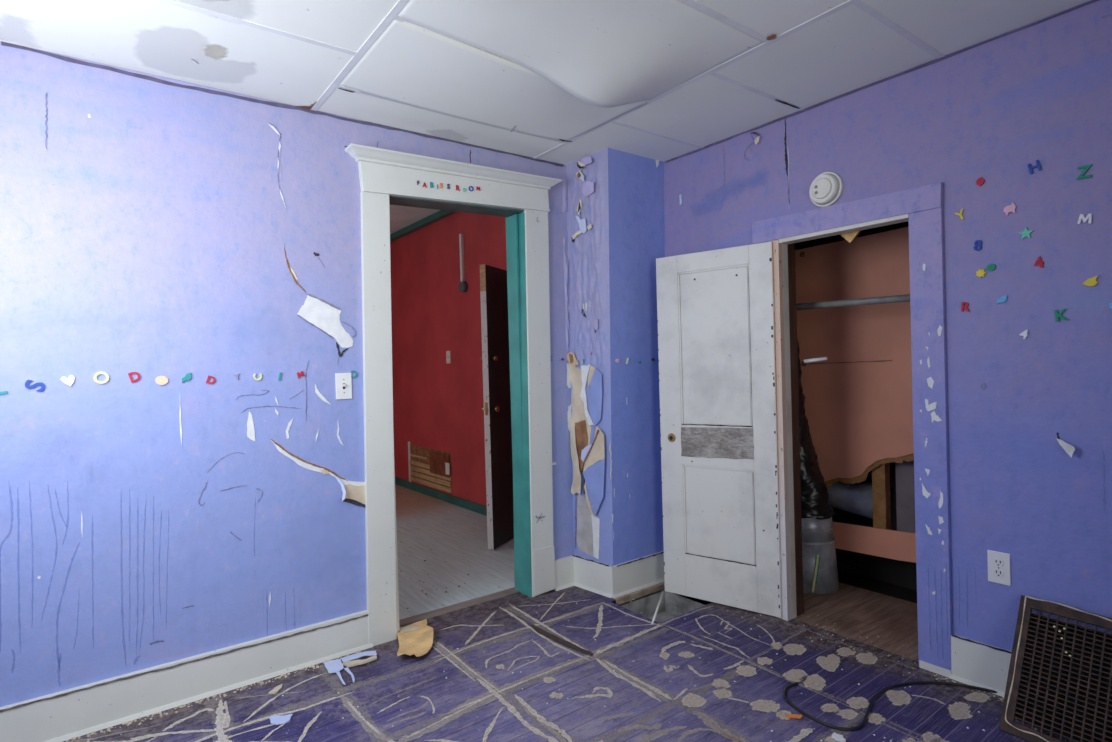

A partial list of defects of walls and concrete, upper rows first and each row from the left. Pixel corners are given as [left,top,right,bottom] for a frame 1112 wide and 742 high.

crack [665,0,1111,193]
peeling [572,157,594,242]
peeling [297,294,356,365]
crack [801,358,892,366]
peeling [920,325,942,423]
peeling [271,397,365,507]
peeling [920,468,944,545]